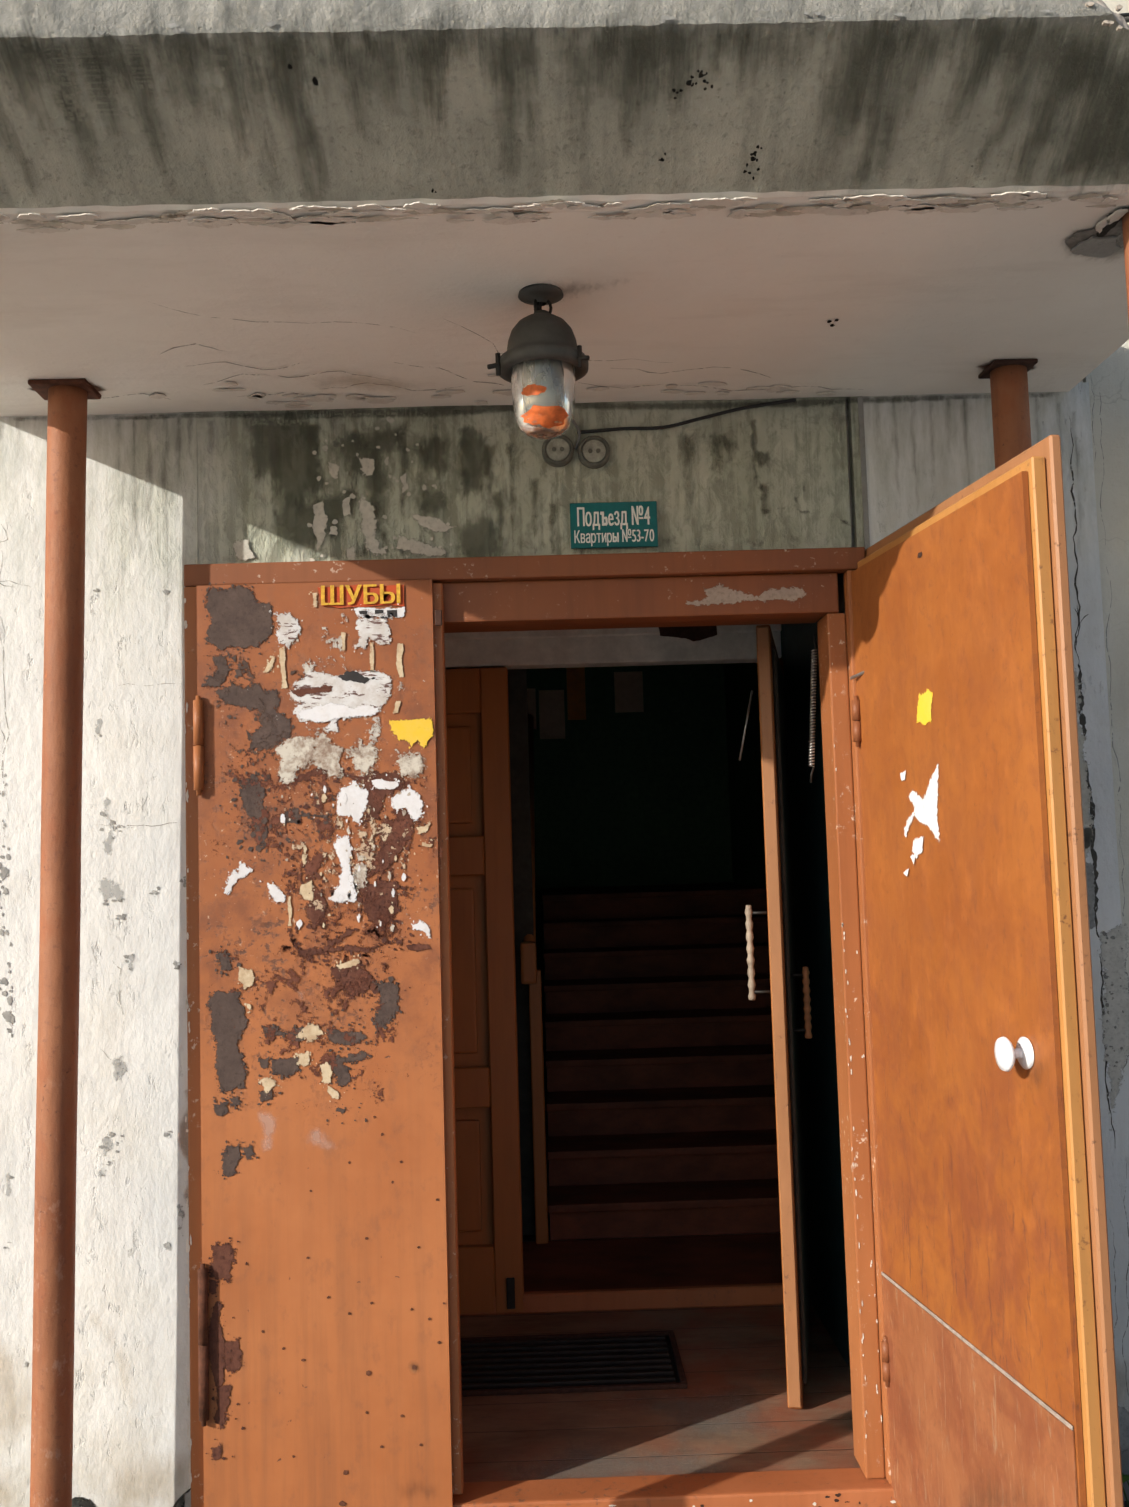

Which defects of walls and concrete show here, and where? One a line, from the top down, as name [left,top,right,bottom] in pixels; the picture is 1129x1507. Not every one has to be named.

spalling [1102,4,1129,31]
leakage [966,29,1129,173]
peeling [163,343,512,561]
leakage [163,405,514,557]
leakage [574,396,960,513]
spalling [659,626,717,641]
peeling [685,583,807,607]
peeling [163,582,443,1125]
crack [1069,379,1129,1396]
peeling [1097,924,1129,1131]
peeling [163,1199,247,1507]